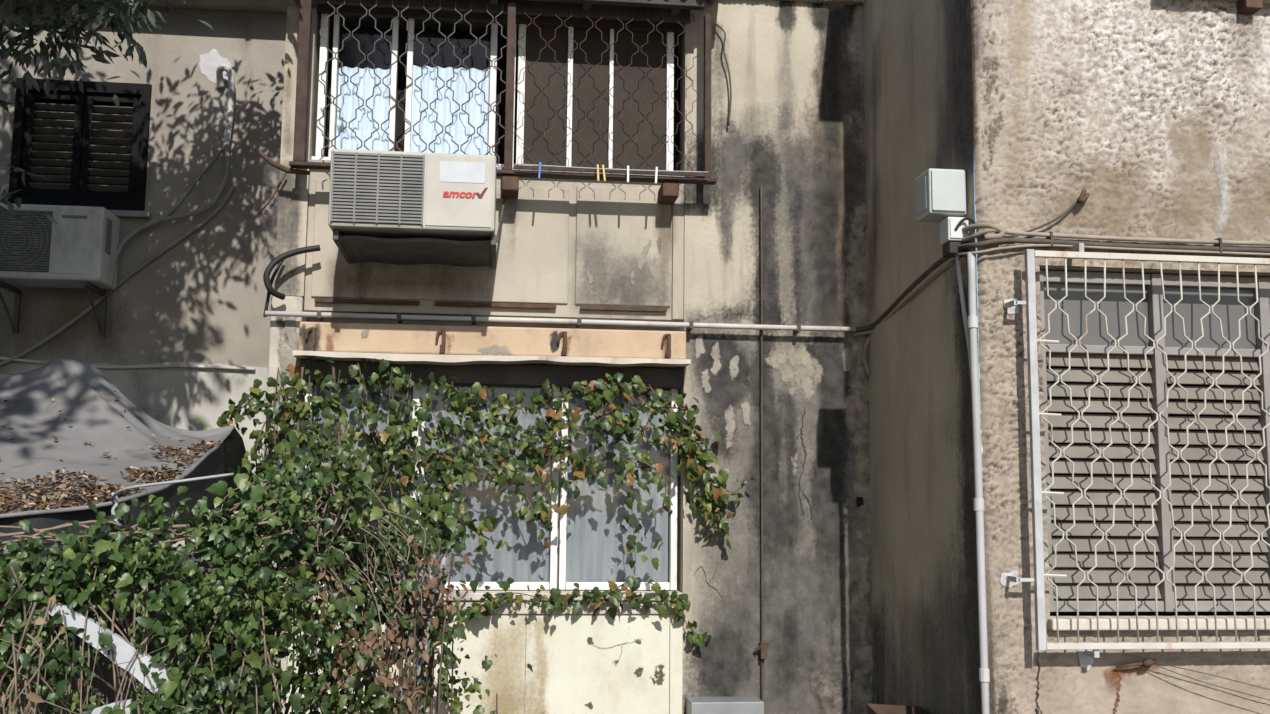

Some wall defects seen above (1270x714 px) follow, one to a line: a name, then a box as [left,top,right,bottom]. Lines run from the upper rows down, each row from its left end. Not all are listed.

damp [937,0,979,170]
damp [583,250,658,307]
peeling [695,334,739,393]
damp [683,0,877,714]
peeling [765,345,823,401]
peeling [725,401,751,449]
crack [1035,650,1043,714]
rust [1105,665,1156,688]